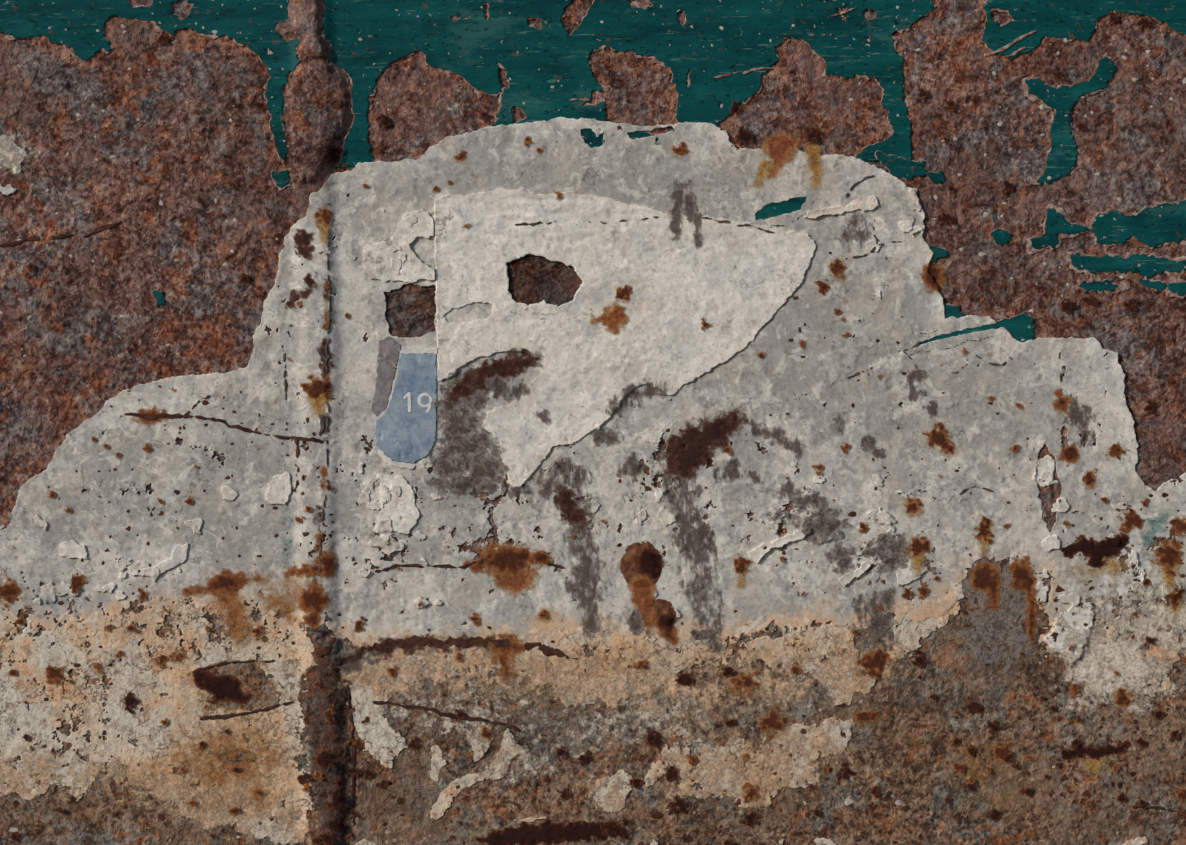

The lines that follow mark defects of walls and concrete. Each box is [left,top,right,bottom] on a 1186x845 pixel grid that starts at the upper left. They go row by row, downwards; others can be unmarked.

peeling [0,0,301,195]
rust [718,38,891,189]
peeling [979,0,1186,60]
rust [0,0,353,530]
crack [120,345,330,573]
crack [317,203,332,371]
damp [606,378,666,417]
rust [617,541,683,645]
damp [616,408,805,655]
damp [766,478,911,574]
rust [892,0,1186,644]
peeling [1026,198,1186,315]